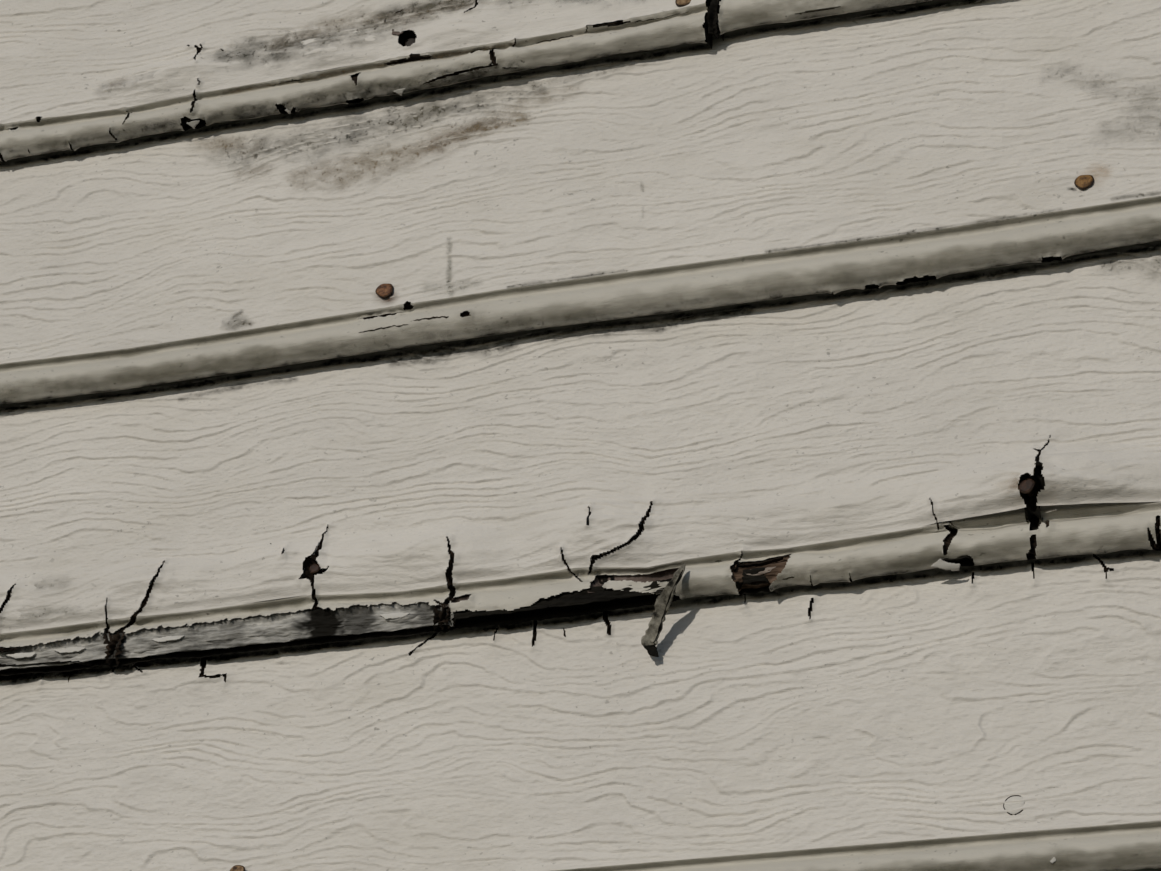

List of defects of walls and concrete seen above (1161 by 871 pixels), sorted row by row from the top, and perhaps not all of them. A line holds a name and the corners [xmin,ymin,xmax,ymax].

damp [219,19,342,64]
damp [357,0,470,35]
crack [0,587,14,613]
crack [103,562,165,672]
crack [270,535,329,610]
crack [409,539,470,656]
spalling [433,568,679,630]
crack [561,503,653,582]
peeling [731,552,790,592]
crack [931,500,975,583]
crack [1018,437,1050,579]
crack [1148,516,1161,549]